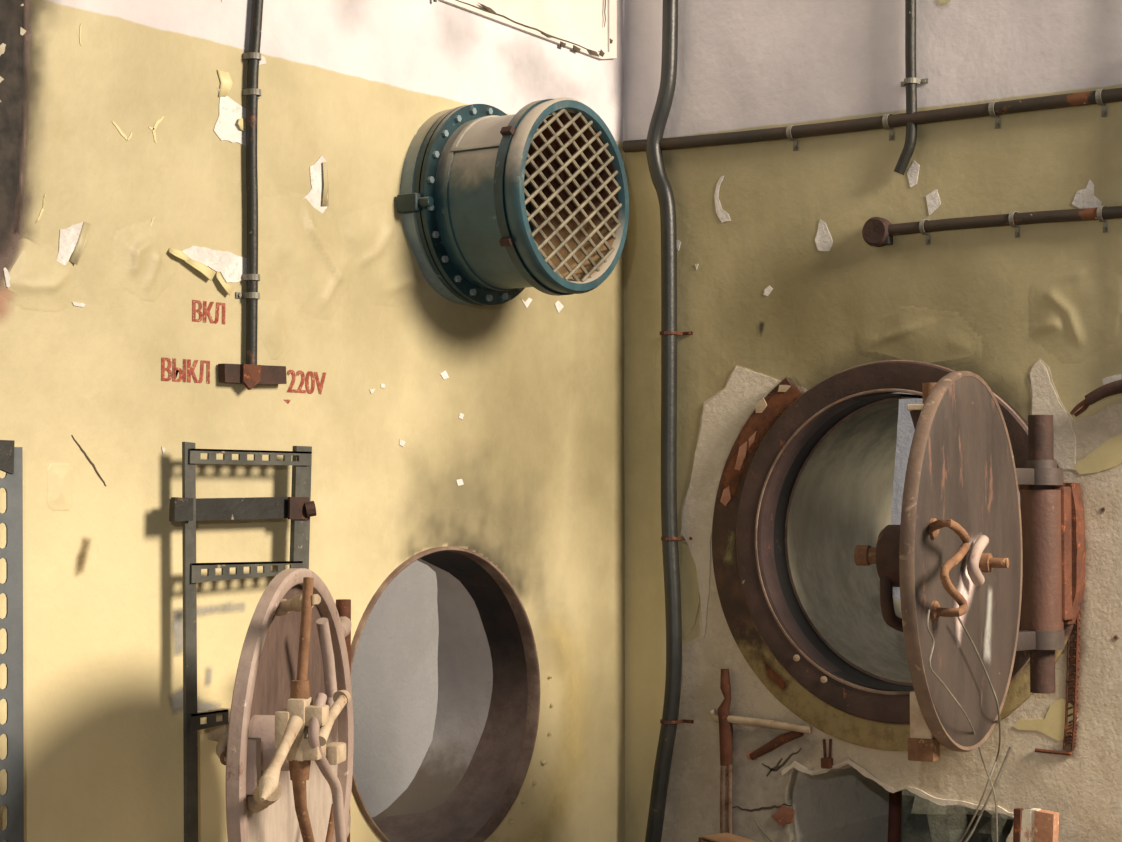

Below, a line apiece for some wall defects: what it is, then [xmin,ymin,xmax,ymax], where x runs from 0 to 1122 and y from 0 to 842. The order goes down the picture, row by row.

peeling [213,70,246,146]
peeling [302,155,329,213]
peeling [714,176,731,223]
peeling [57,222,91,265]
peeling [815,220,833,251]
peeling [169,246,247,296]
corrosion [720,381,803,506]
peeling [661,359,1122,842]
corrosion [762,657,786,691]